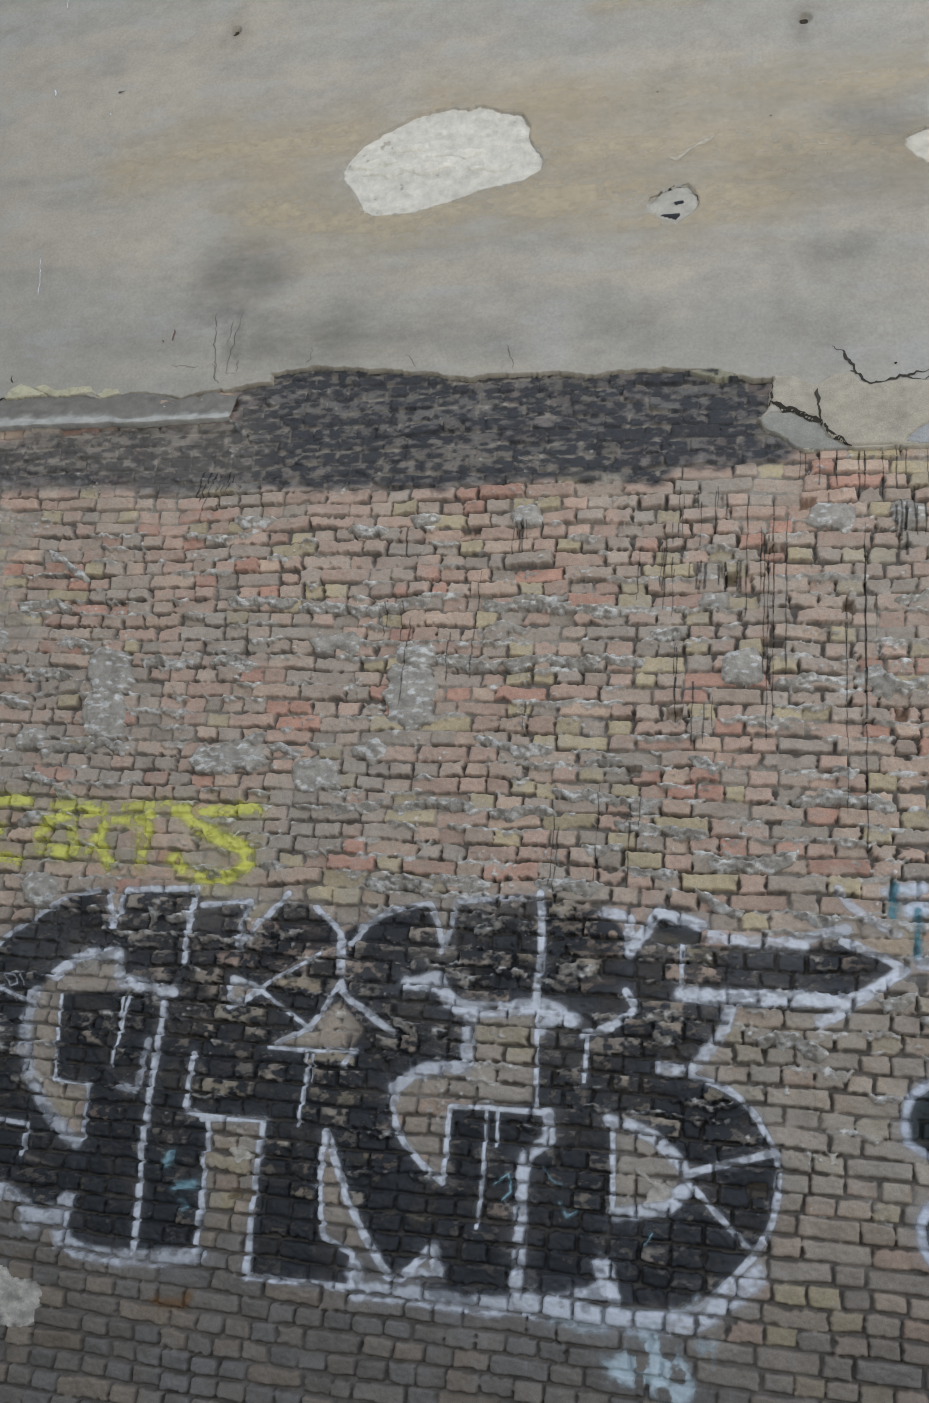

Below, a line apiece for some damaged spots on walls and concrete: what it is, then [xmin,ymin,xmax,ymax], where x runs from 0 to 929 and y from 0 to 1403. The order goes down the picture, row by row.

spalling [344,107,543,216]
spalling [905,129,929,162]
spalling [649,188,698,222]
crack [834,346,929,384]
peeling [3,384,120,401]
crack [769,383,852,446]